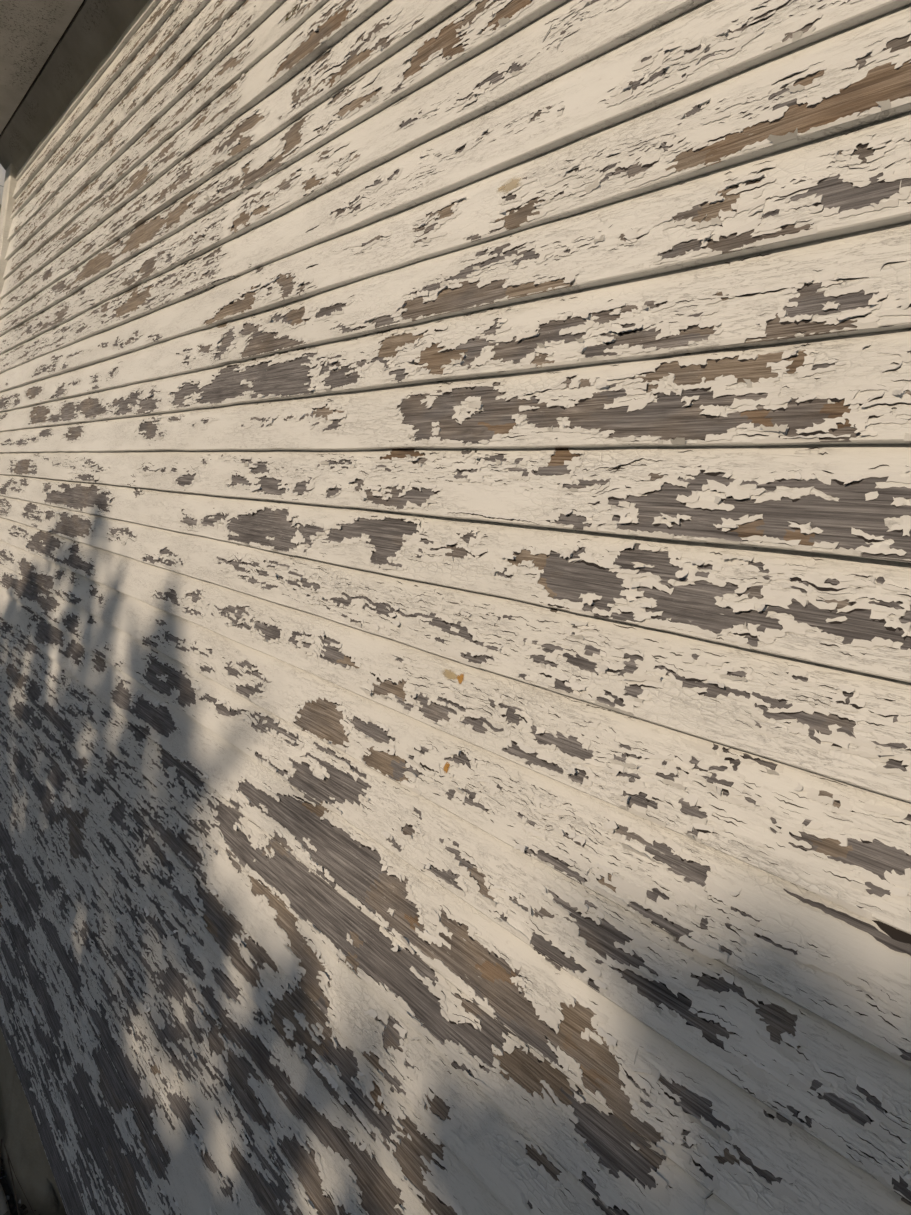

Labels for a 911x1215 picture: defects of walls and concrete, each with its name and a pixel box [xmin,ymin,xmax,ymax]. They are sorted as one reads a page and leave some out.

peeling [0,0,911,668]
peeling [0,454,911,1215]
crack [213,552,911,889]
crack [423,746,901,1044]